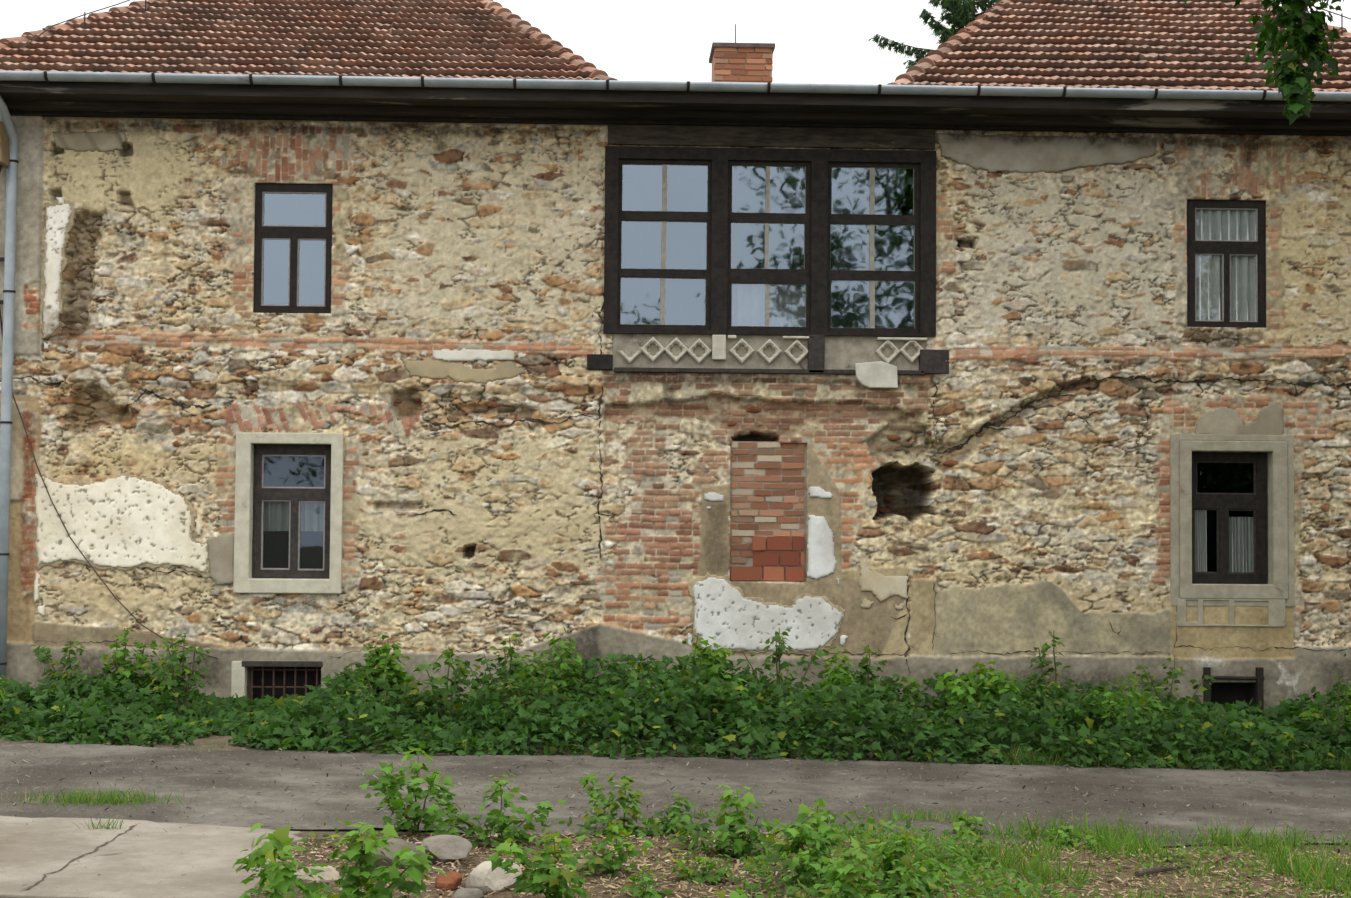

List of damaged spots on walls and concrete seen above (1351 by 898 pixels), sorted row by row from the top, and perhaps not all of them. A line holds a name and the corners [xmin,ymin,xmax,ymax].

peeling [50,130,133,157]
peeling [937,133,1176,182]
spalling [40,187,136,349]
spalling [957,238,977,249]
spalling [60,379,139,437]
peeling [387,348,545,423]
crack [932,374,1351,453]
spalling [603,375,1094,522]
spalling [371,500,425,511]
peeling [33,471,234,616]
spalling [462,544,476,559]